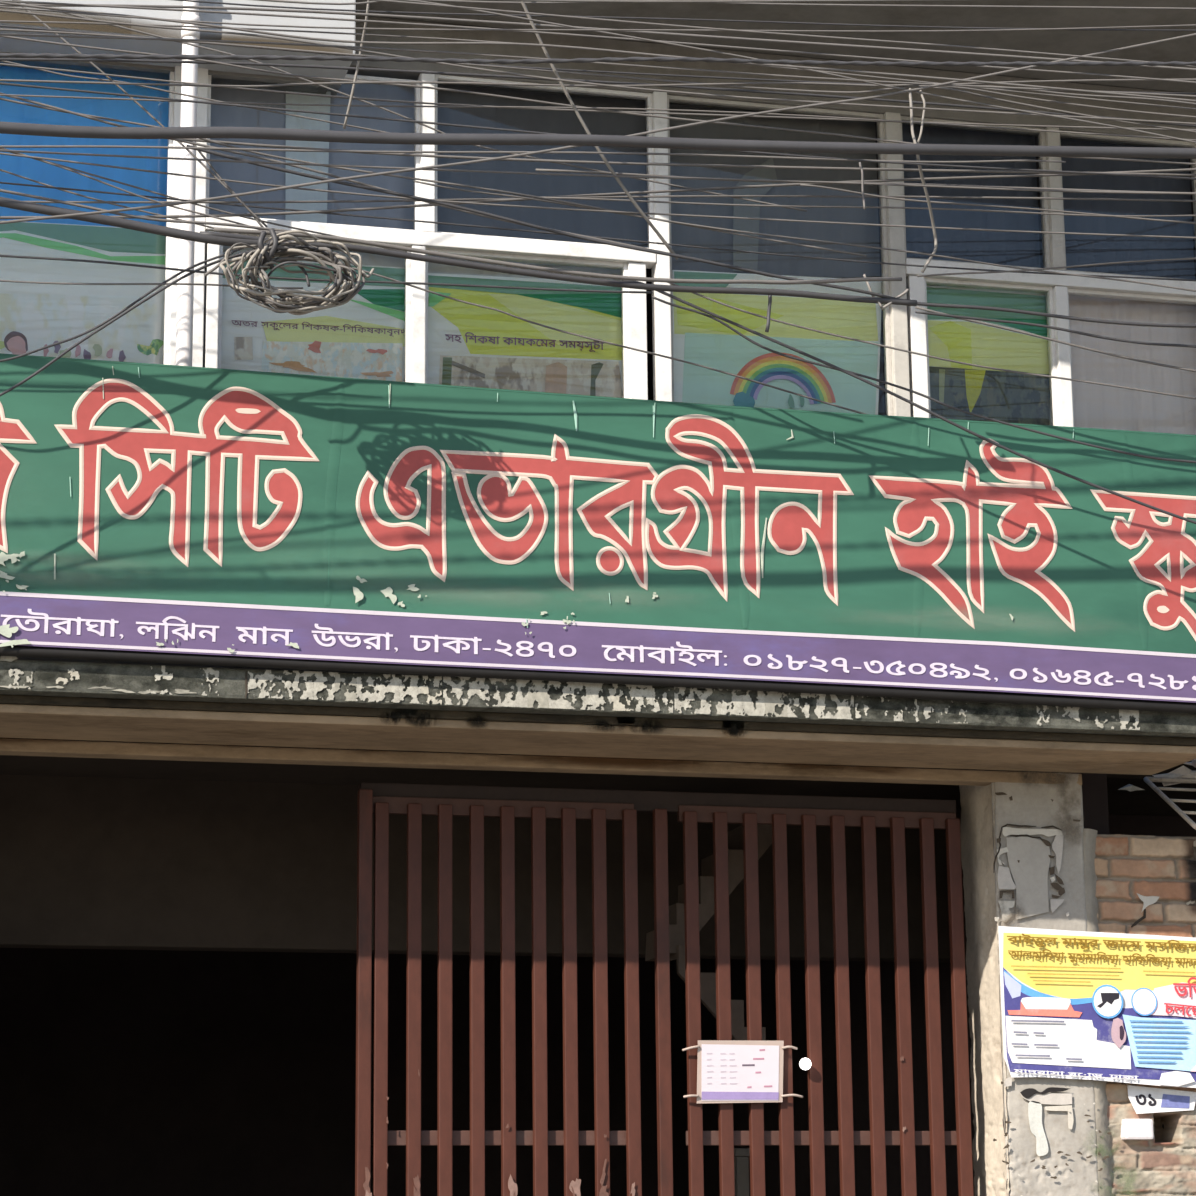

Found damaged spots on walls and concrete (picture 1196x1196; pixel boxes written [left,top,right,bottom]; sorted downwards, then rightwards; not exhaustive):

peeling [0,551,29,592]
peeling [353,576,367,603]
peeling [381,584,427,607]
peeling [0,624,219,696]
peeling [248,670,968,724]
peeling [1036,705,1140,730]
peeling [995,827,1069,922]